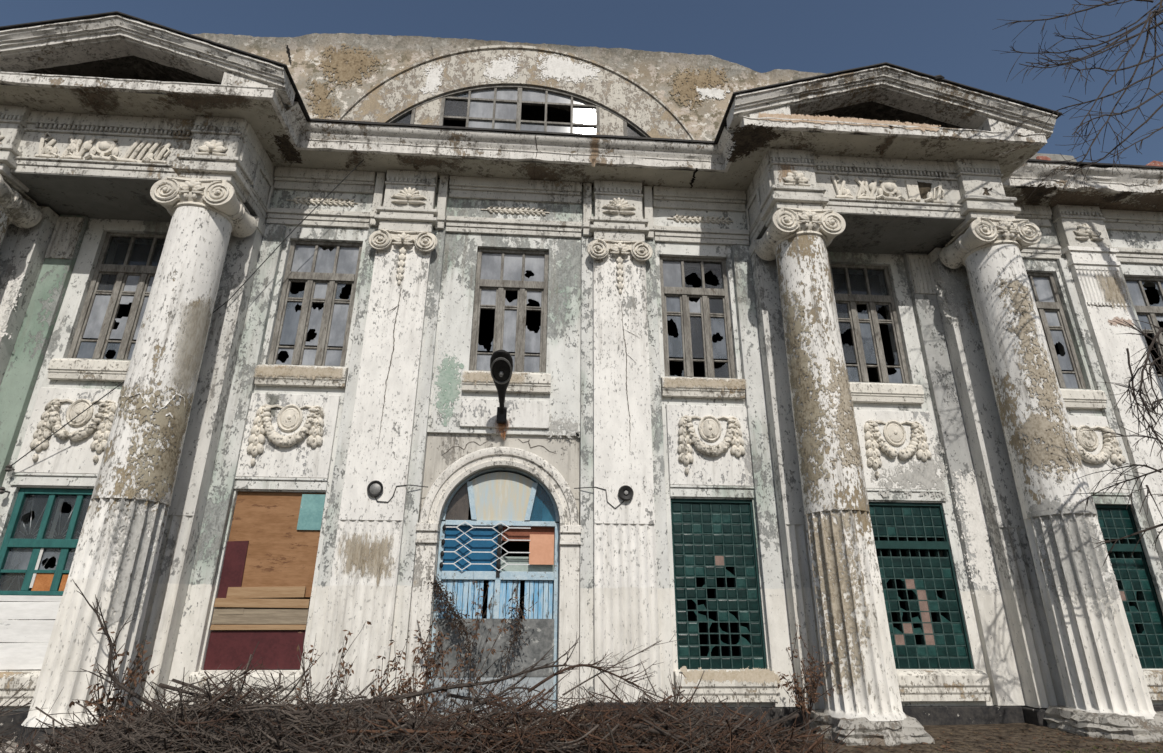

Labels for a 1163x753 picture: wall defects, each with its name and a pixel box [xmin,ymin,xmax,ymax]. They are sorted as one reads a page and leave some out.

spalling [303,43,387,119]
spalling [420,63,445,95]
spalling [479,51,605,84]
spalling [665,65,733,110]
spalling [917,181,932,199]
peeling [0,270,25,338]
crack [378,290,401,443]
crack [621,305,636,435]
peeling [1001,278,1083,481]
peeling [98,384,193,629]
peeling [781,287,1000,695]
peeling [1026,494,1120,619]